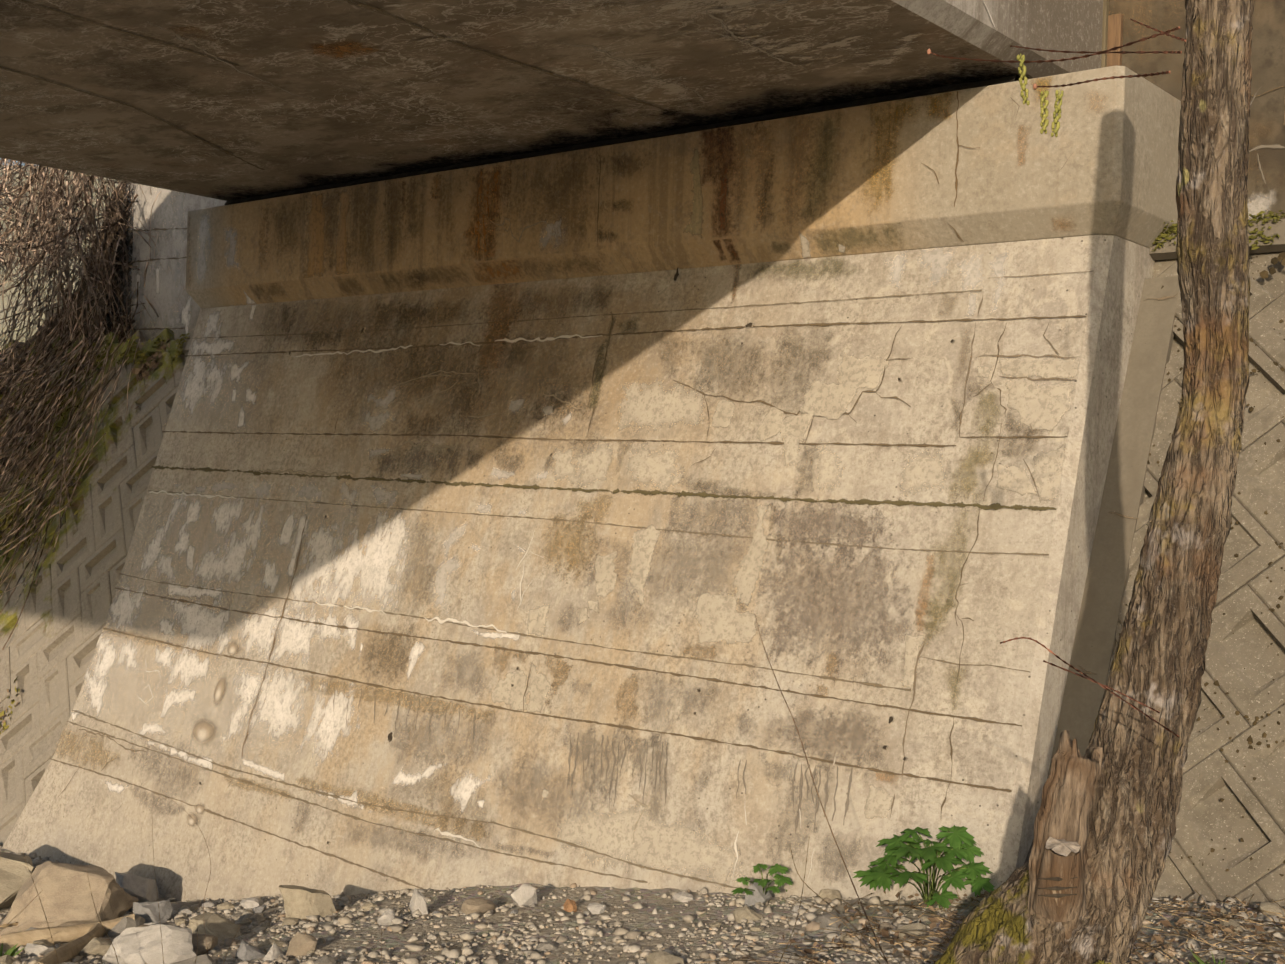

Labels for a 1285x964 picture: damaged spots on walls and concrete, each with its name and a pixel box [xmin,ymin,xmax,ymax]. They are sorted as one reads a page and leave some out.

leakage [547,0,923,66]
leakage [212,48,1019,249]
crack [922,91,980,242]
crack [674,327,911,465]
leakage [72,490,476,770]
leakage [243,760,285,781]
leakage [393,764,446,785]
leakage [451,772,491,812]
leakage [567,732,668,807]
leakage [792,764,852,833]
crack [890,641,925,816]
crack [941,719,954,812]